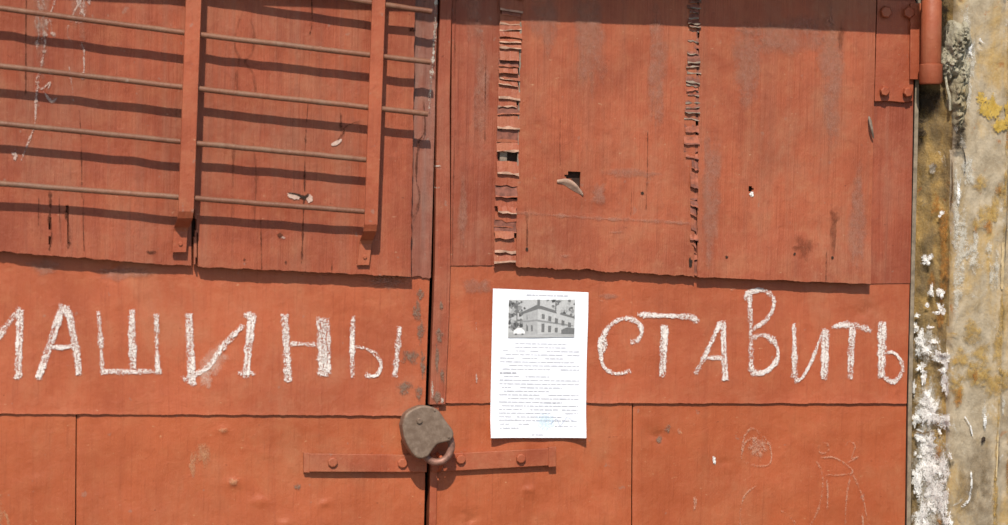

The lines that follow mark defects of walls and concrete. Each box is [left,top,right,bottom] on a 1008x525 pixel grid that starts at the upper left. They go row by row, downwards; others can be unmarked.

crack [38,111,85,251]
leakage [918,84,944,146]
leakage [941,0,951,54]
efflorescence [966,39,975,108]
efflorescence [952,158,999,310]
peeling [911,284,953,525]